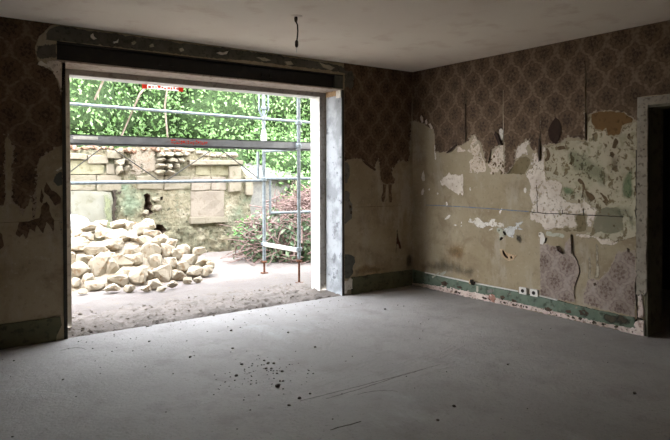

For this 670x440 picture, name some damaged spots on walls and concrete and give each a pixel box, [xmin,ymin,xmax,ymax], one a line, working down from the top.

flaking render [38,60,66,92]
flaking render [344,191,352,224]
peeling [440,111,637,245]
flaking render [412,271,645,336]